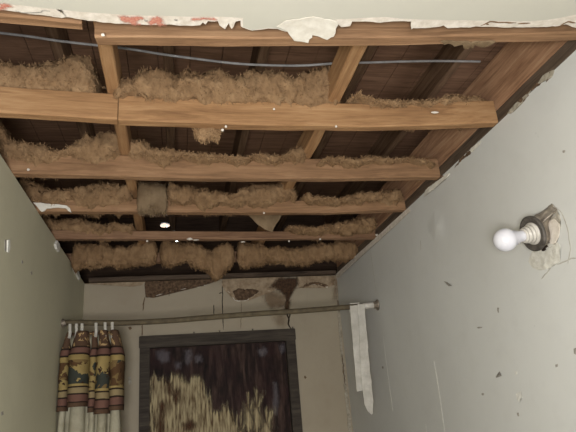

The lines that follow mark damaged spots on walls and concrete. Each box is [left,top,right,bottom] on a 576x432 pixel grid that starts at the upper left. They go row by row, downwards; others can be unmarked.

flaking render [528,204,576,279]
flaking render [72,268,285,301]
damp [266,277,298,309]